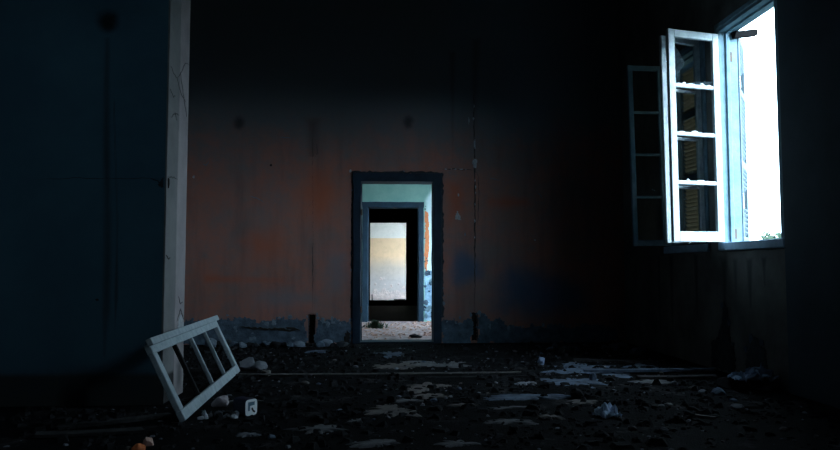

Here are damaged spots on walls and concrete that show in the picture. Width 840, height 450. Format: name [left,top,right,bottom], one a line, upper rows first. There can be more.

flaking render [184,169,445,345]
rust [288,154,352,243]
rust [443,176,470,251]
crack [445,95,479,308]